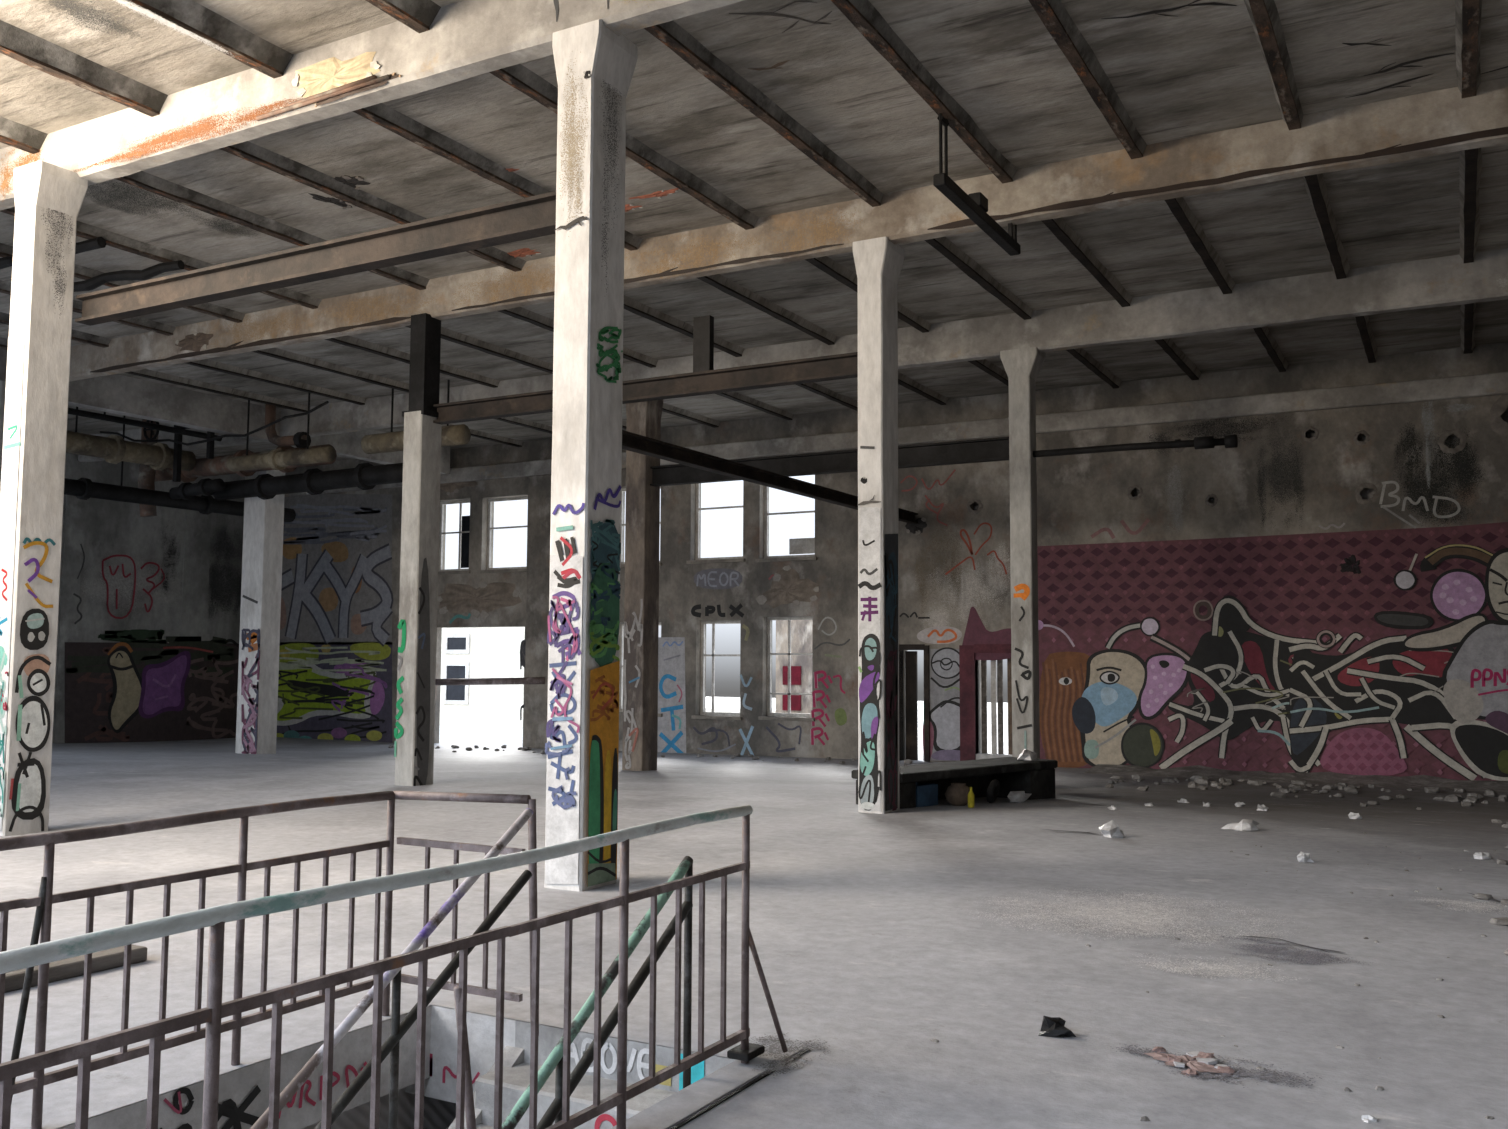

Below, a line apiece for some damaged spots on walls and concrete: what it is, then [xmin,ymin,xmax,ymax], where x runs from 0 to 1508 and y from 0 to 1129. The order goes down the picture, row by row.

rust [73,98,303,172]